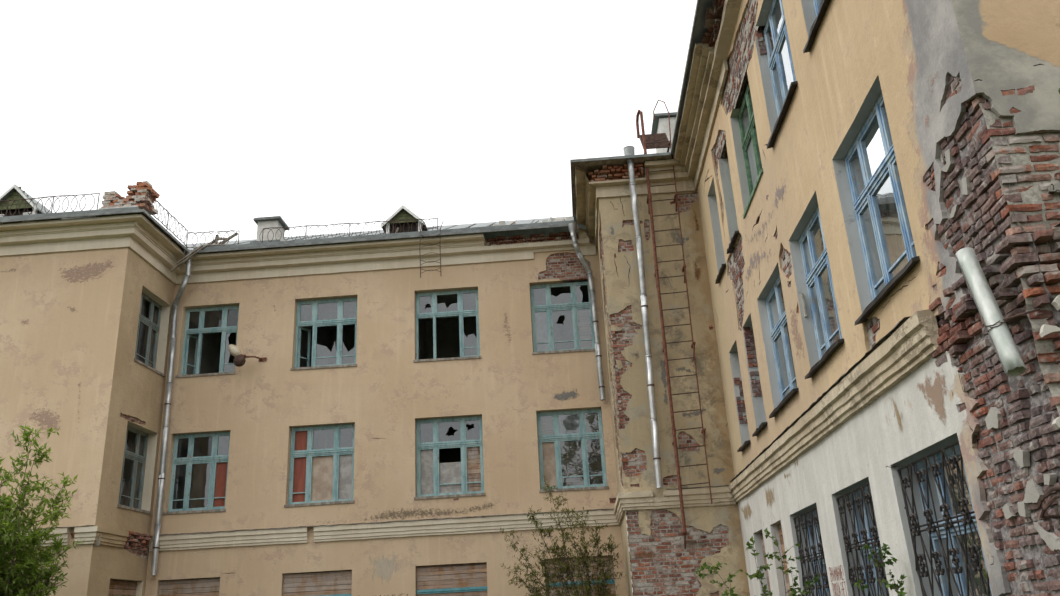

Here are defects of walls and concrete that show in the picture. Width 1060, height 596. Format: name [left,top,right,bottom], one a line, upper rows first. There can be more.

spalling [702,0,725,48]
flaking render [722,0,767,115]
flaking render [487,219,650,487]
flaking render [728,235,762,424]
flaking render [924,75,1060,596]
flaking render [663,475,682,485]
flaking render [626,509,729,596]